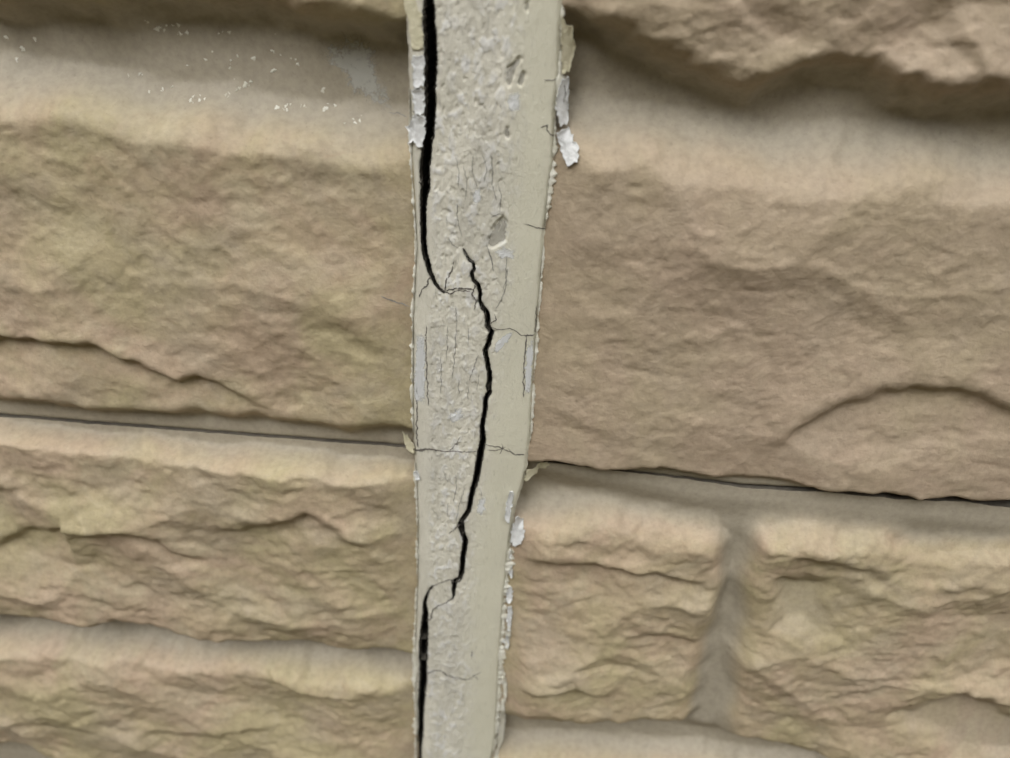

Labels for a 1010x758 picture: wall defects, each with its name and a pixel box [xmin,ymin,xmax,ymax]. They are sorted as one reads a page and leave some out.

peeling [404,0,426,432]
crack [382,0,537,758]
spalling [489,219,506,246]
spalling [506,60,524,85]
peeling [524,245,545,440]
peeling [545,5,579,226]
peeling [493,491,525,758]